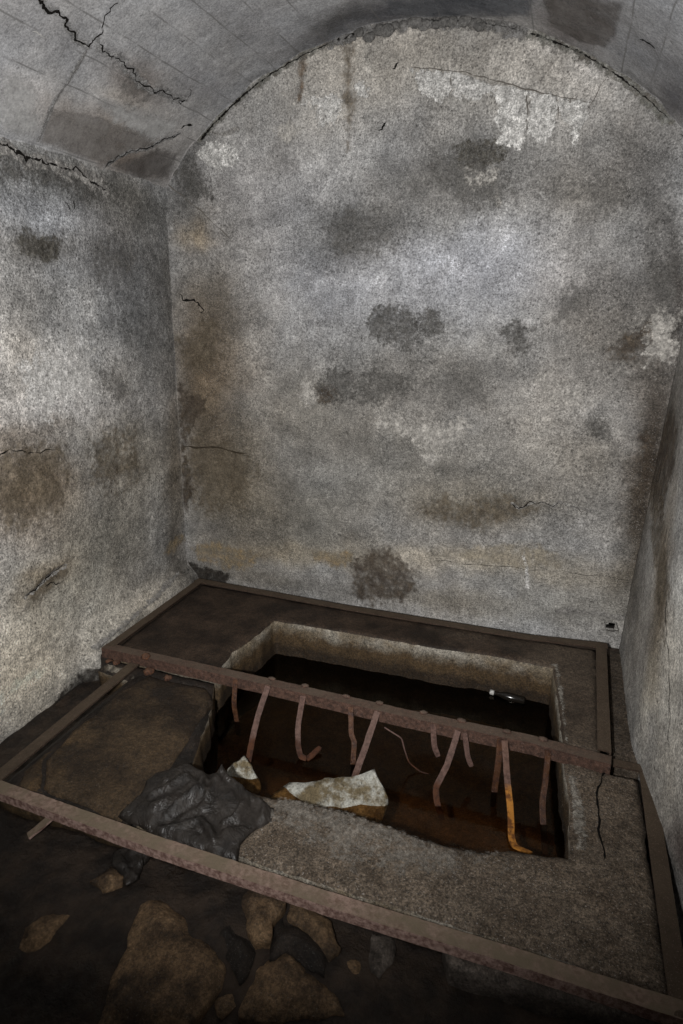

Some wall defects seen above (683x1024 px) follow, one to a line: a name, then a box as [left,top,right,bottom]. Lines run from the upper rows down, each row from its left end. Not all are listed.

crack [0,0,676,197]
leakage [366,304,444,351]
leakage [609,267,683,369]
leakage [297,368,491,466]
crack [0,448,52,456]
crack [184,446,245,454]
crack [511,500,594,512]
leakage [353,549,415,607]
crack [596,772,606,859]